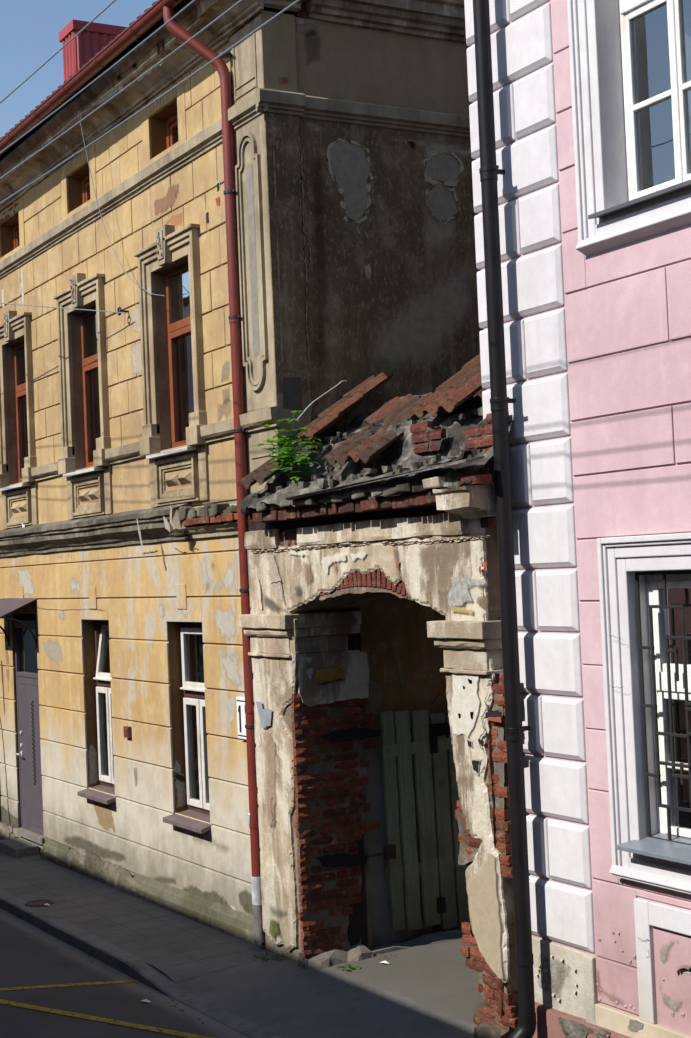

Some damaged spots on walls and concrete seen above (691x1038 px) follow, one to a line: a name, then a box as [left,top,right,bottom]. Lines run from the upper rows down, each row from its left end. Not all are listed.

flaking render [265,530,305,604]
flaking render [317,539,410,600]
peeling [436,559,501,621]
flaking render [449,672,513,878]
leakage [65,837,125,861]
flaking render [291,681,382,959]
leakage [156,878,253,915]
flaking render [461,922,518,1031]
flaking render [535,955,577,1002]
peeling [644,942,673,963]
spalling [559,1017,610,1038]
flaking render [628,1019,643,1032]